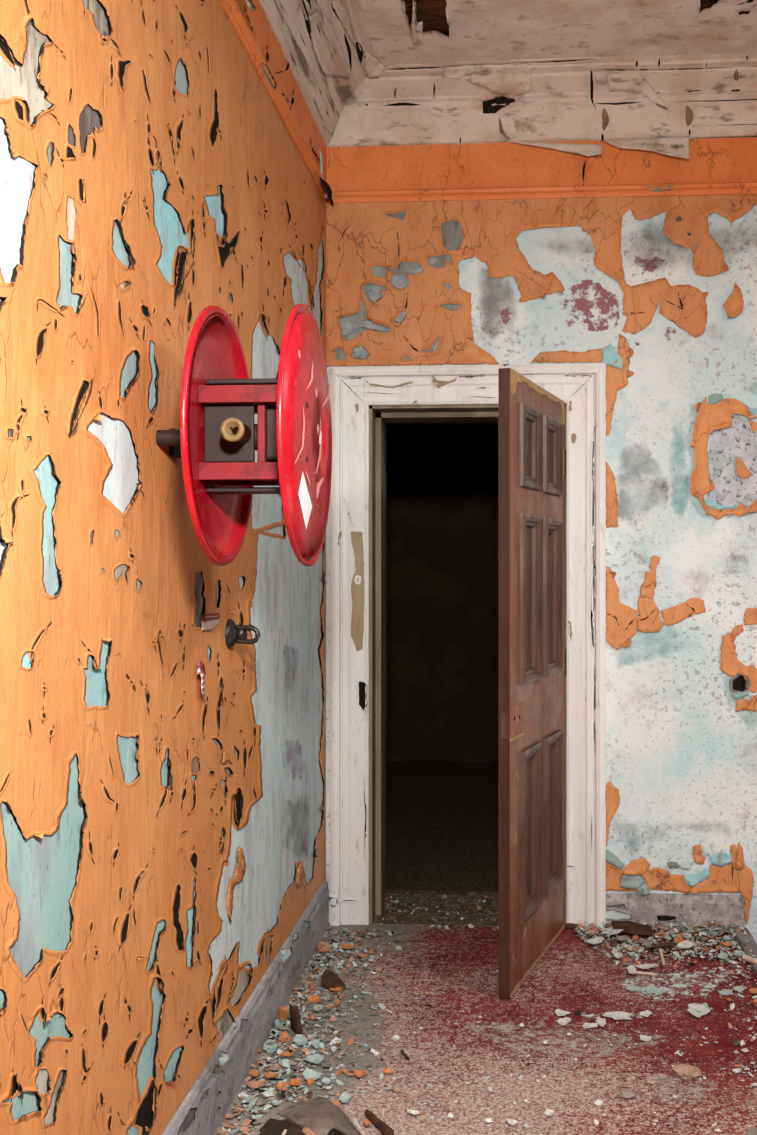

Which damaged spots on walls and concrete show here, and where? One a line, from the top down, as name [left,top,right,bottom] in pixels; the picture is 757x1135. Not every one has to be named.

spalling [399,0,454,37]
peeling [0,13,104,318]
peeling [146,164,228,296]
peeling [279,148,757,435]
peeling [29,451,63,600]
peeling [71,378,143,540]
peeling [690,393,757,519]
peeling [606,555,706,650]
peeling [719,608,757,712]
peeling [0,749,88,983]
peeling [175,486,367,1135]
peeling [606,781,754,925]